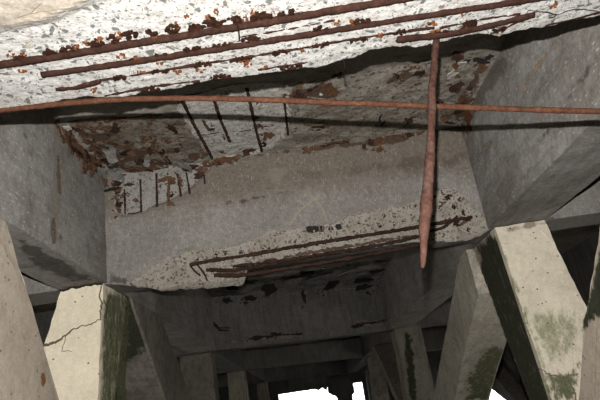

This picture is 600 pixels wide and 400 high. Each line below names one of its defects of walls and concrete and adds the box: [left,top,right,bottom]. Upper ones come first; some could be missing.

rust [202,148,263,167]
spalling [0,0,600,310]
rust [302,130,425,154]
crack [43,283,106,352]